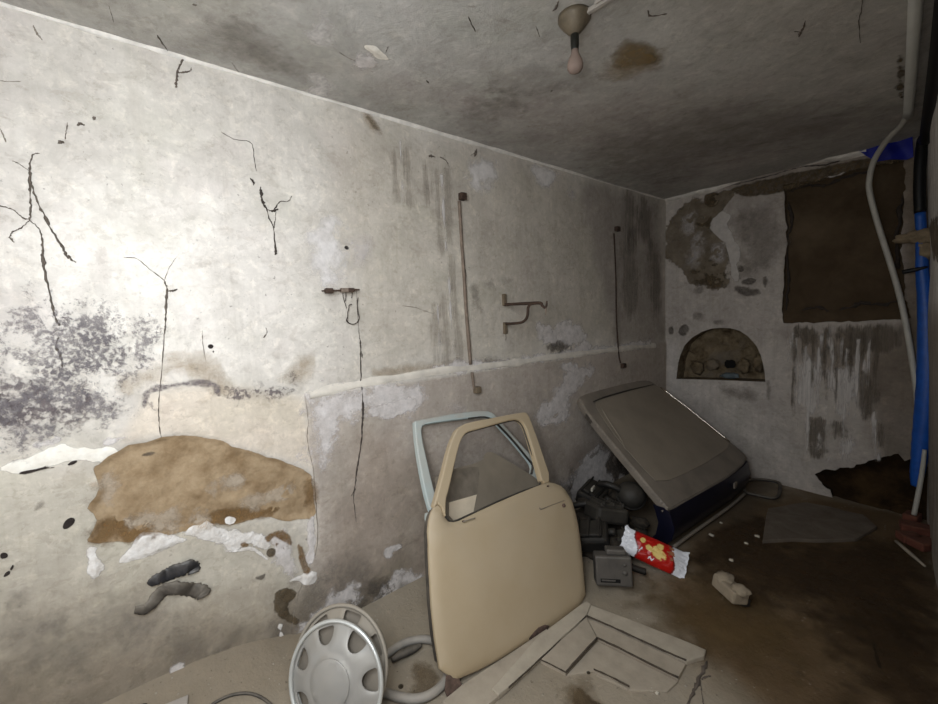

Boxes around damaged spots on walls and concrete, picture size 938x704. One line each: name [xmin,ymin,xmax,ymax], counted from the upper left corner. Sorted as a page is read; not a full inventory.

flaking render [665,190,741,289]
water stain [0,304,159,450]
crack [351,291,364,518]
water stain [787,324,897,460]
flaking render [87,435,316,574]
crack [687,661,711,704]